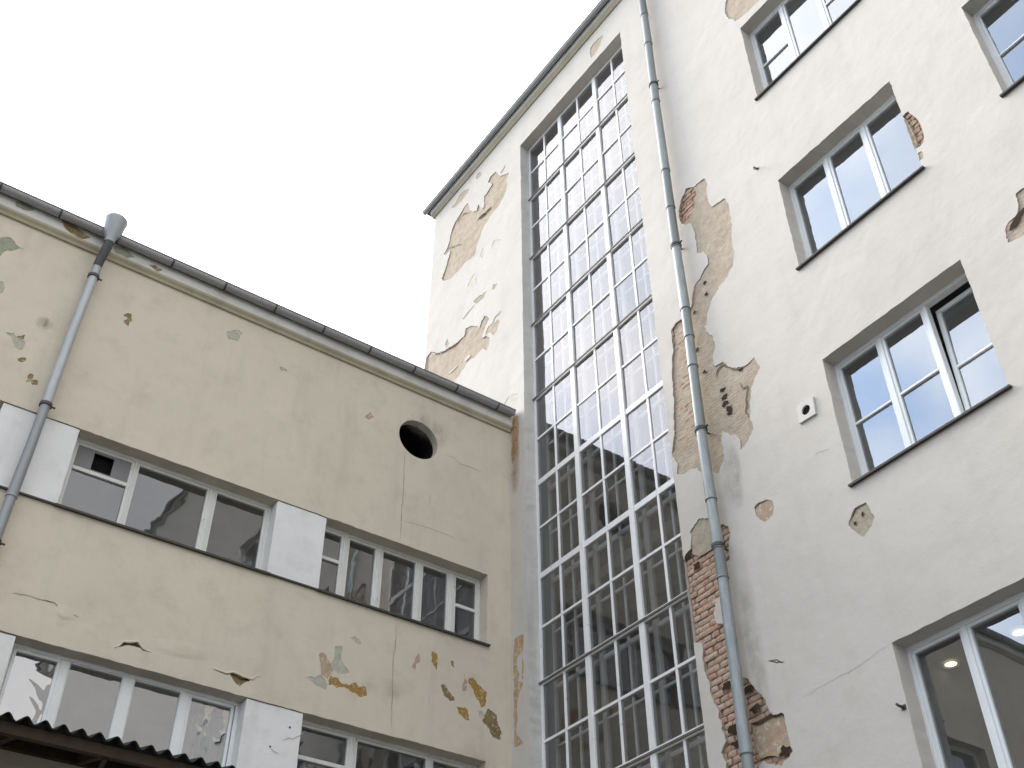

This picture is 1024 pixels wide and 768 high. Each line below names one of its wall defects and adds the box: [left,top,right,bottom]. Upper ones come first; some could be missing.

flaking render [903,112,924,161]
peeling [0,237,21,256]
flaking render [442,166,509,281]
flaking render [1005,188,1024,243]
flaking render [425,274,501,382]
flaking render [671,178,760,475]
flaking render [754,500,774,522]
flaking render [849,502,874,537]
peeling [306,636,367,697]
peeling [412,652,438,670]
peeling [441,635,524,747]
flaking render [682,518,793,768]